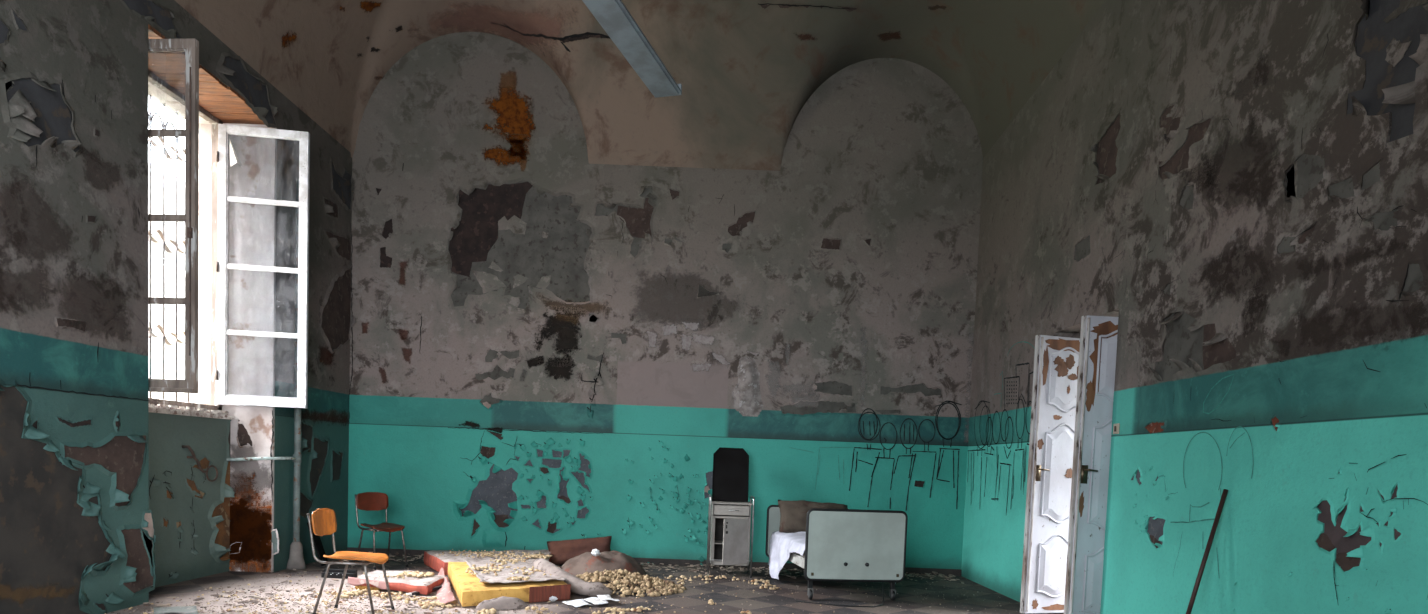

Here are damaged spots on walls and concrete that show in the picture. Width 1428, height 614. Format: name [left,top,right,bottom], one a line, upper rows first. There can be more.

crack [491,22,611,52]
peeling [445,177,682,419]
peeling [453,430,602,539]
peeling [1144,513,1168,552]
peeling [1313,467,1404,575]